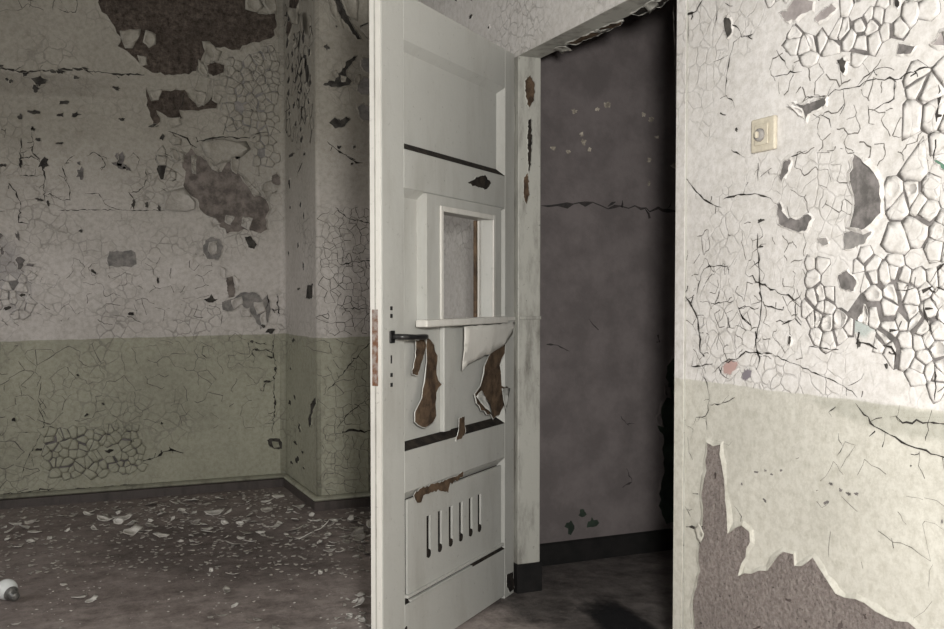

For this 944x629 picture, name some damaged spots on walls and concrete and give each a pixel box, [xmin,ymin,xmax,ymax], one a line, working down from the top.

spalling [17,109,42,142]
spalling [56,100,82,118]
crack [1,65,141,78]
spalling [95,0,370,335]
spalling [467,174,491,190]
spalling [522,75,536,205]
crack [541,200,676,219]
crack [673,1,752,116]
peeling [765,0,944,404]
crack [0,254,280,494]
crack [685,51,944,620]
spalling [690,436,941,629]